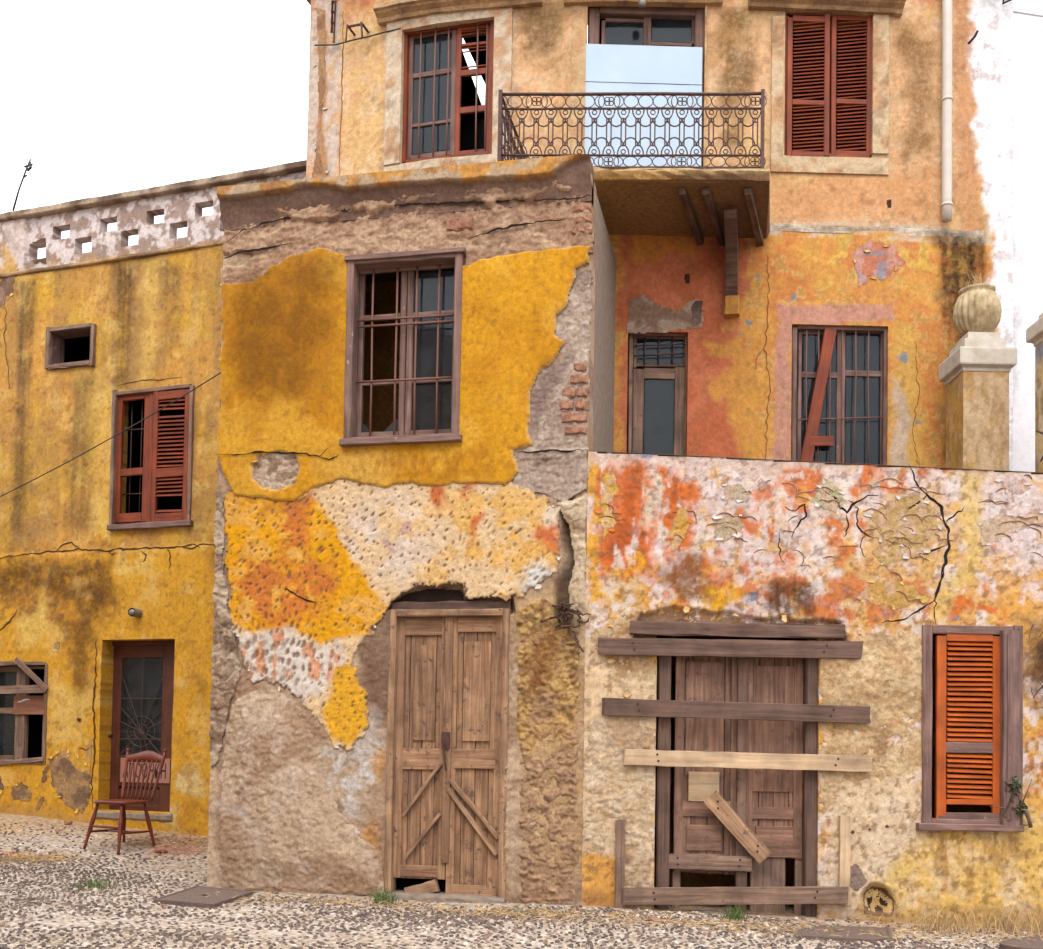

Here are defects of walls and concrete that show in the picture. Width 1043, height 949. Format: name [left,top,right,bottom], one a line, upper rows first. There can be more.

crack [2,300,10,388]
spalling [220,180,595,288]
spalling [627,294,705,334]
peeling [852,239,906,287]
damp [935,234,981,317]
crack [0,542,215,569]
flaking render [176,269,593,794]
peeling [666,483,767,553]
crack [778,343,963,623]
peeling [824,478,954,610]
peeling [977,474,1043,557]
spalling [0,739,93,814]